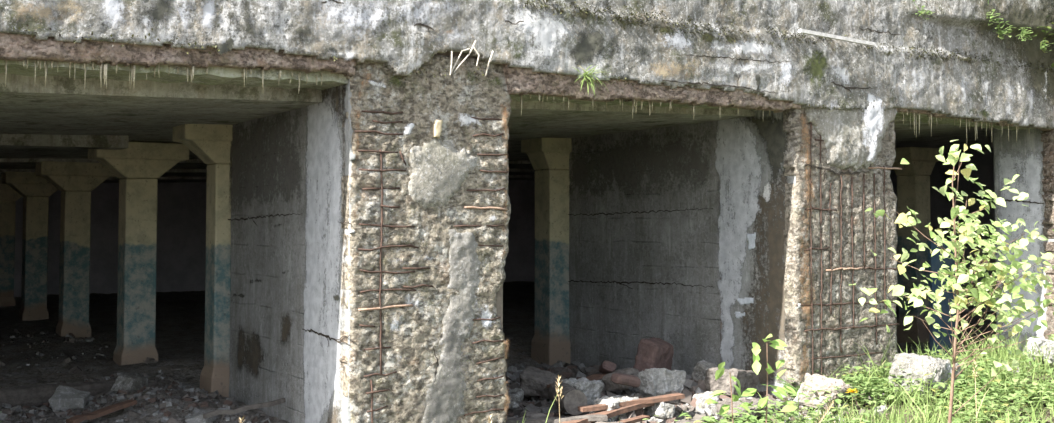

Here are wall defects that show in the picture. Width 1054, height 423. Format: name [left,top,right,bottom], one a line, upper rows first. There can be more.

damp [103,0,189,29]
damp [202,0,214,27]
damp [217,1,256,55]
damp [320,0,457,32]
damp [504,8,617,65]
damp [663,32,691,48]
damp [711,41,792,96]
damp [906,55,972,101]
damp [978,1,1054,112]
spalling [0,33,902,423]
peeling [896,108,1054,339]
crack [302,329,351,346]